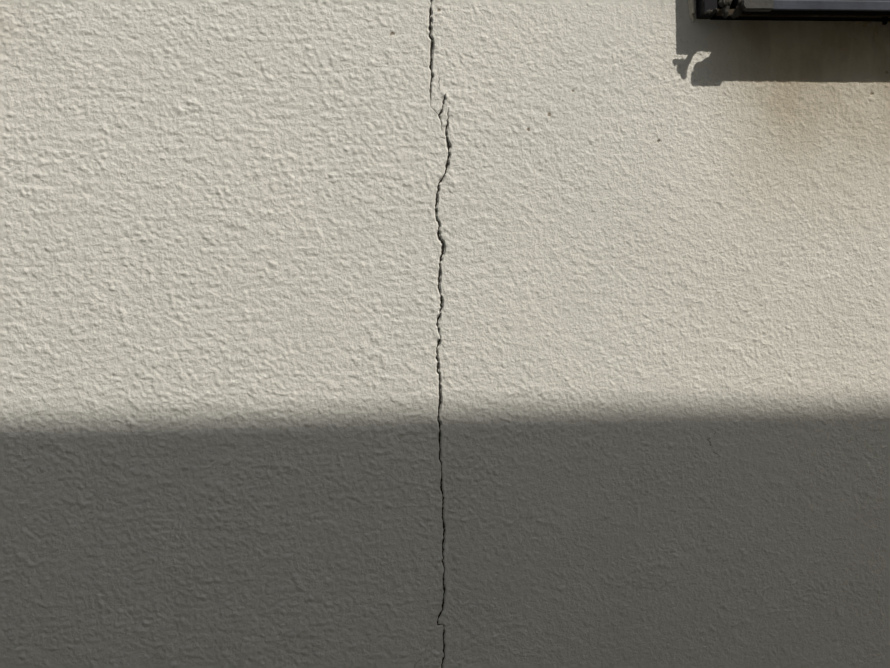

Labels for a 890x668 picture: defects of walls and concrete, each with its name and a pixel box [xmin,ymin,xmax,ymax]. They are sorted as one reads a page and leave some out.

crack [415,0,450,667]